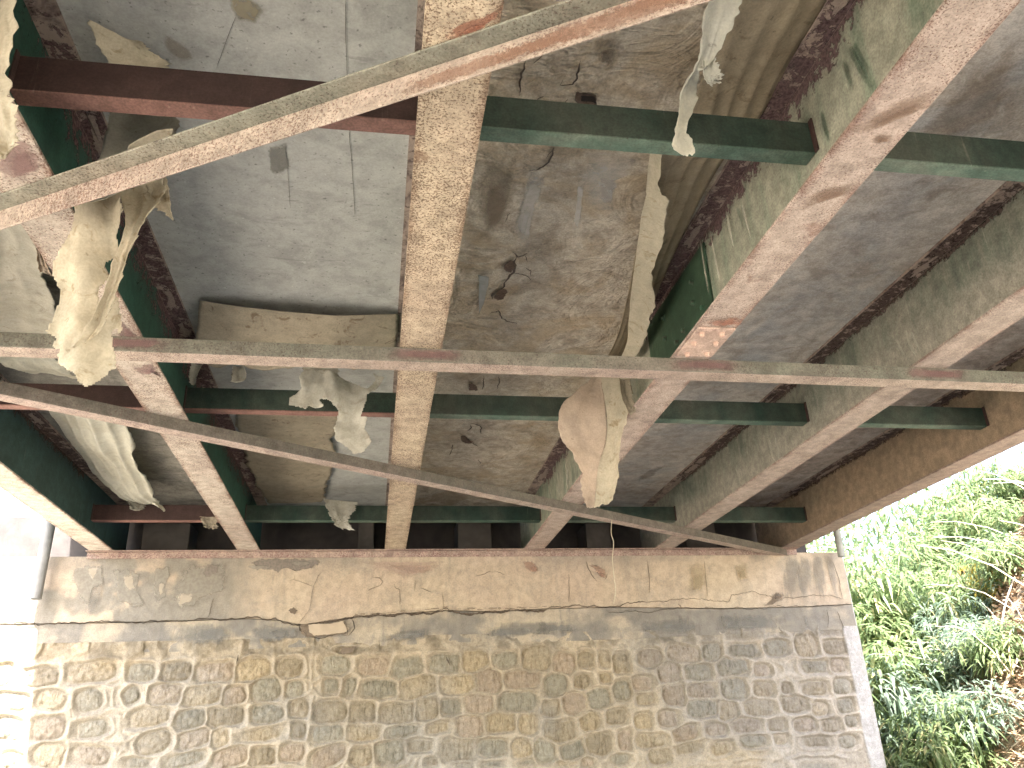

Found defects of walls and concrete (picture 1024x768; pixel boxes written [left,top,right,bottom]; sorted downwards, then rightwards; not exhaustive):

crack [519,56,581,102]
corrosion [759,0,863,121]
crack [530,148,554,171]
crack [491,252,531,323]
corrosion [649,160,766,321]
corrosion [807,181,1024,364]
corrosion [911,369,975,407]
corrosion [667,425,750,486]
corrosion [788,428,905,497]
peeling [73,566,143,607]
spalling [289,607,356,654]
crack [0,561,847,639]